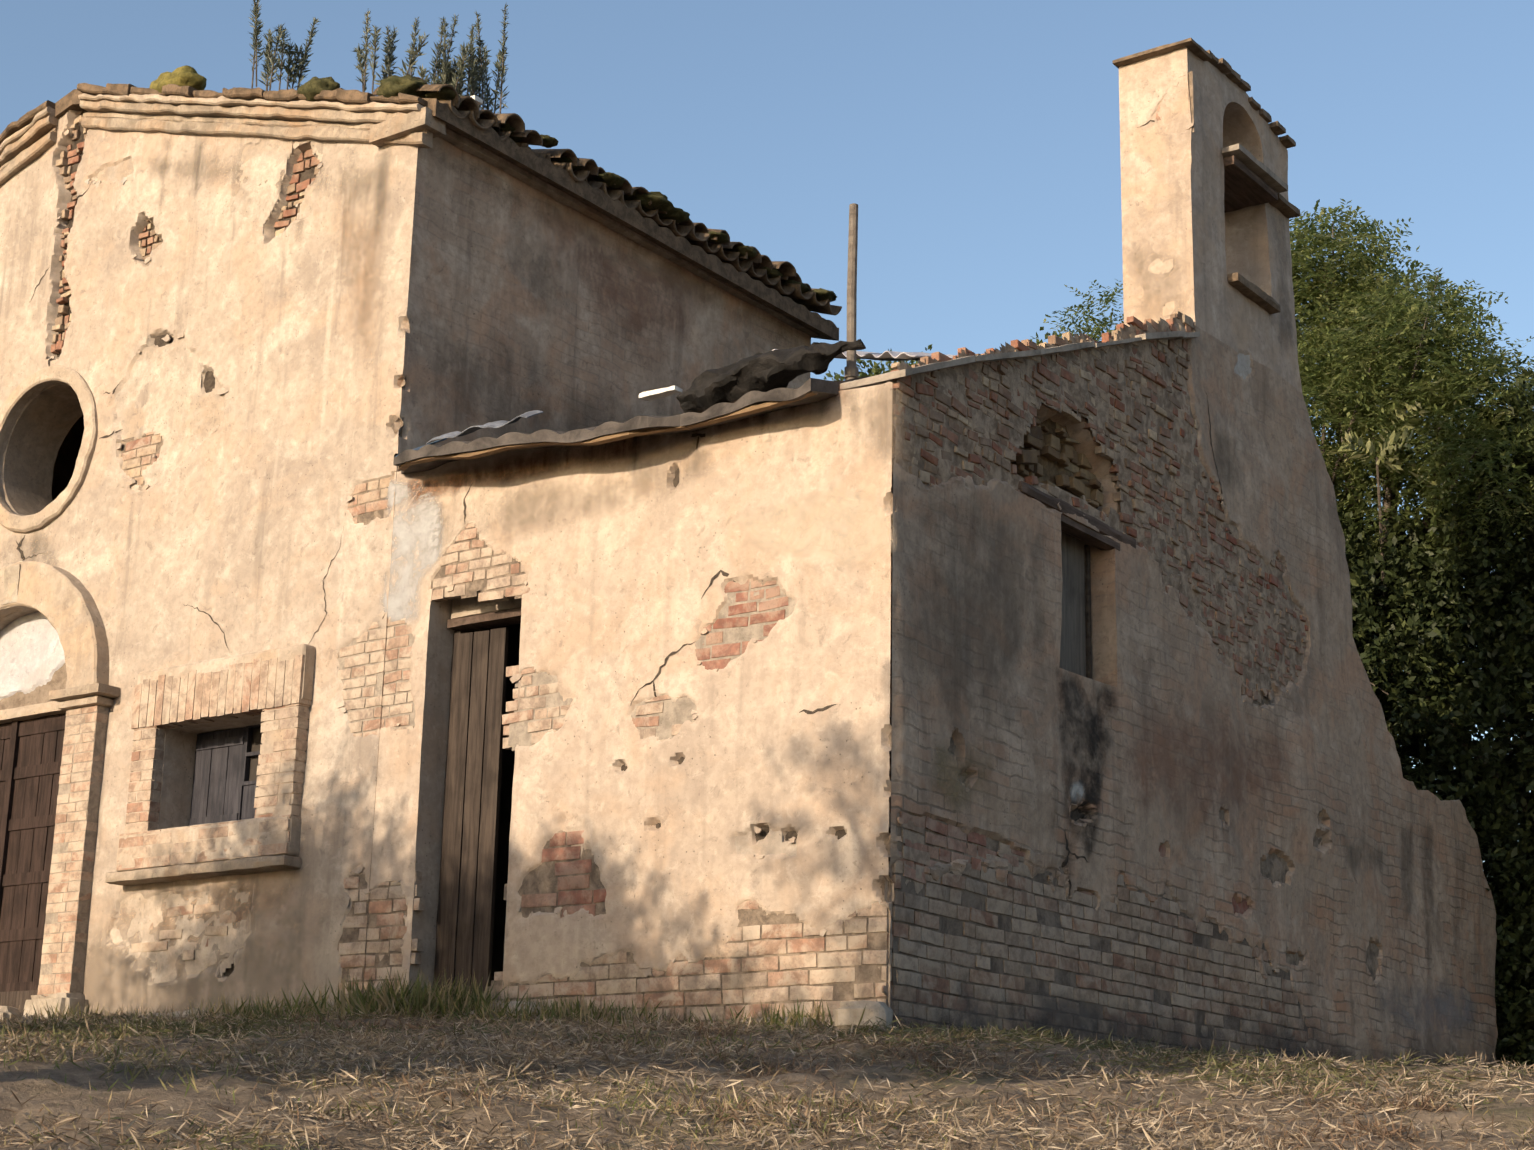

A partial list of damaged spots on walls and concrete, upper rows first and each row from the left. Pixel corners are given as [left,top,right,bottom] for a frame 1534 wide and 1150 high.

peeling [230,139,323,237]
flaking render [891,311,1309,706]
flaking render [336,611,415,738]
flaking render [429,523,530,603]
flaking render [502,665,573,751]
crack [630,642,694,706]
crack [701,570,735,599]
flaking render [695,578,796,672]
leakage [1061,680,1114,853]
flaking render [337,864,426,1008]
flaking render [486,779,1308,1063]
leakage [1256,1041,1343,1066]